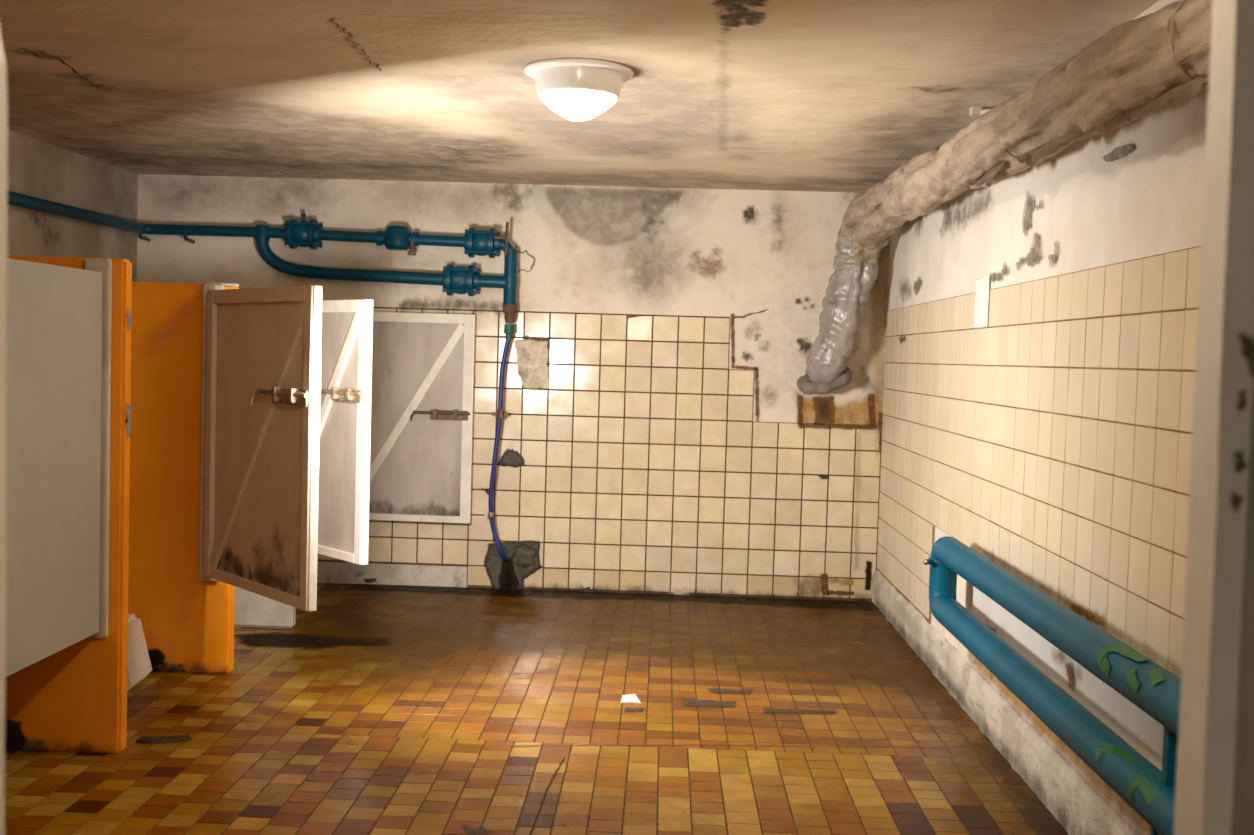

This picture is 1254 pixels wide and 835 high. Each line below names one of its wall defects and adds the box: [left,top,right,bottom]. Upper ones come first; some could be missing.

water stain [713,0,766,27]
crack [23,48,98,88]
crack [329,18,383,72]
water stain [458,74,708,148]
water stain [549,191,678,243]
peeling [991,195,1057,282]
corrosion [797,377,883,452]
peeling [1237,389,1248,411]
peeling [1234,451,1248,473]
peeling [1230,492,1243,513]
water stain [968,650,1159,835]